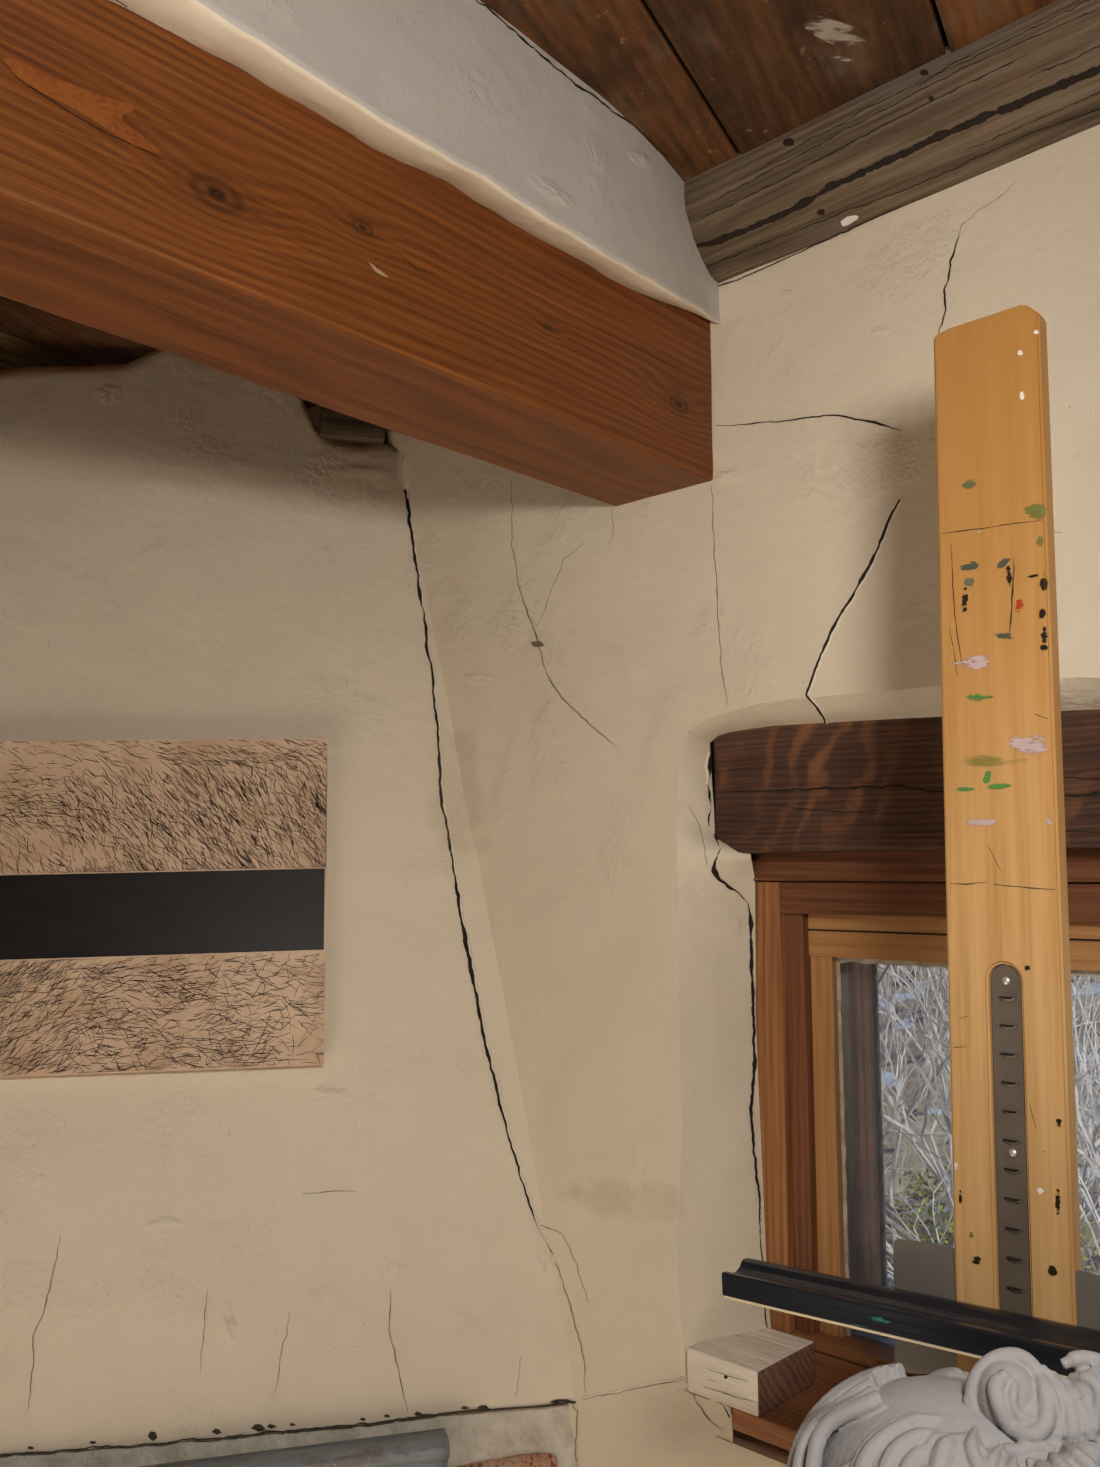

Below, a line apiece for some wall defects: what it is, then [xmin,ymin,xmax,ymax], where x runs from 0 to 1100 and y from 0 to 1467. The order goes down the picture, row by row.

crack [717,171,1016,334]
crack [717,414,902,431]
crack [805,500,902,724]
crack [1064,777,1100,833]
crack [399,447,751,1462]
crack [689,752,944,1261]